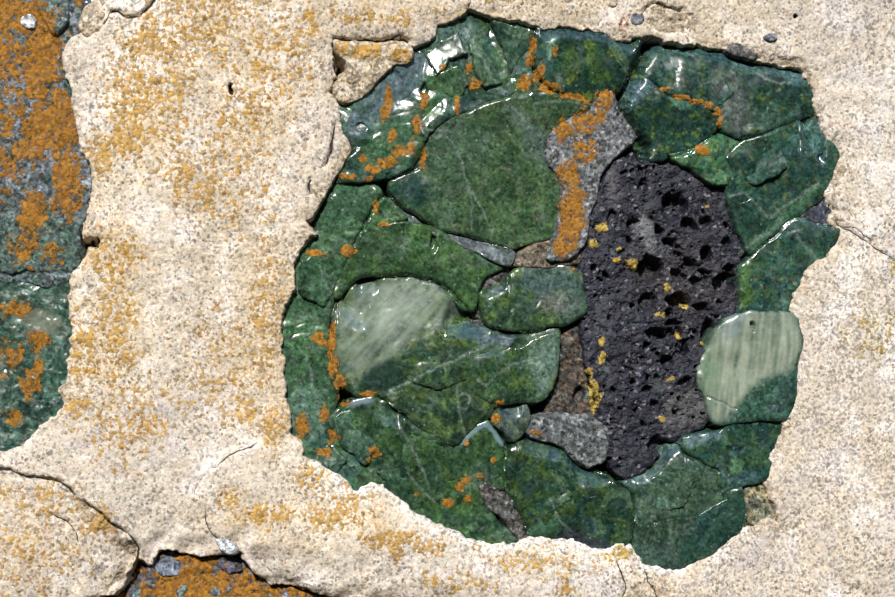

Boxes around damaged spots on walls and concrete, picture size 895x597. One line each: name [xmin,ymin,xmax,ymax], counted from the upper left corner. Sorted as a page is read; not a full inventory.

spalling [721,43,809,80]
peeling [523,408,611,469]
crack [0,467,139,557]
peeling [742,483,777,527]